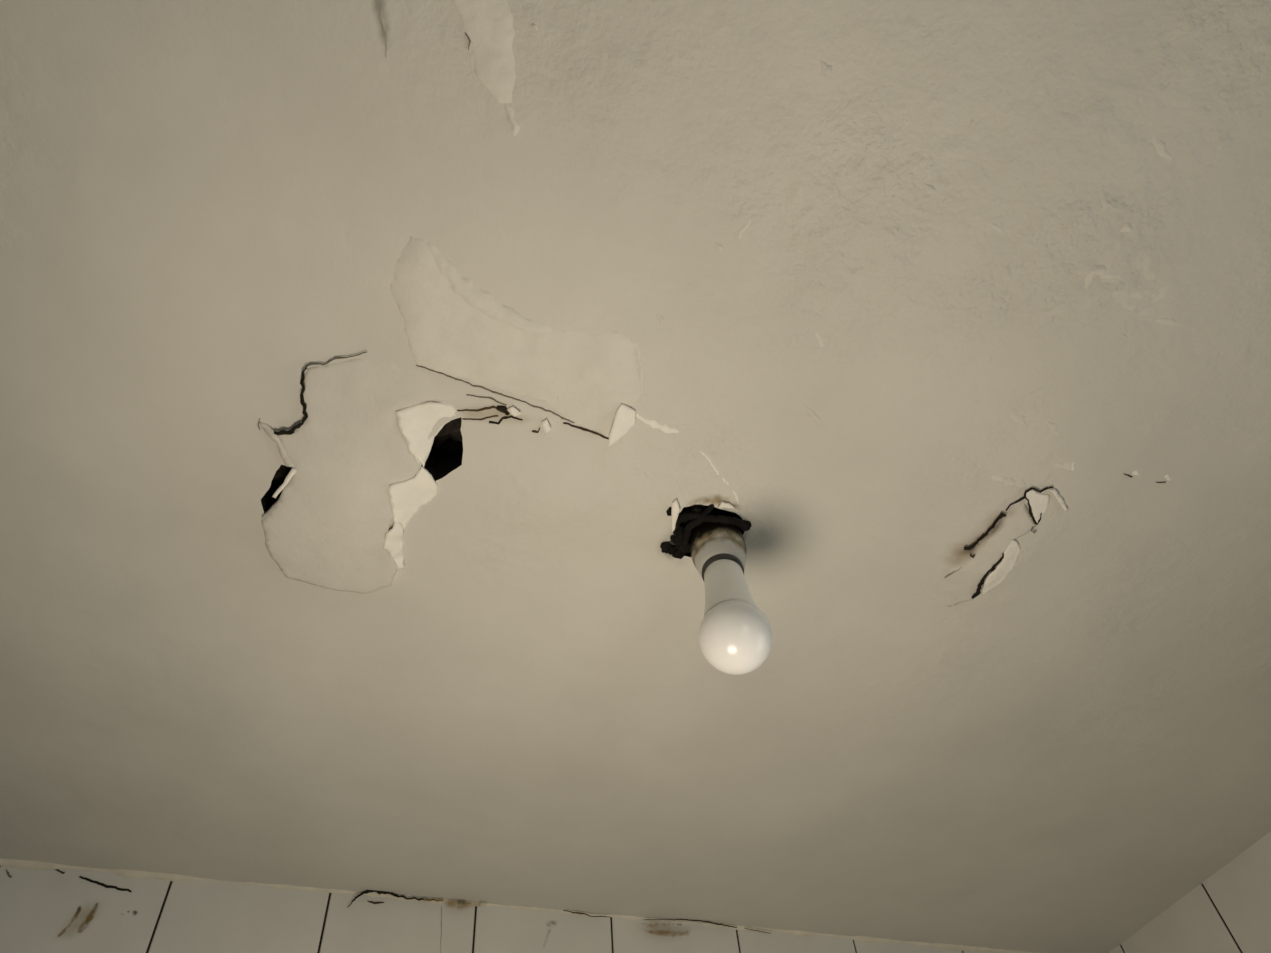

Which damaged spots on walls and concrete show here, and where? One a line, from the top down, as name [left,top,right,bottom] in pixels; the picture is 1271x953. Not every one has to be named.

crack [376,0,387,52]
flaking render [452,0,520,136]
flaking render [257,351,463,594]
flaking render [936,463,1077,607]